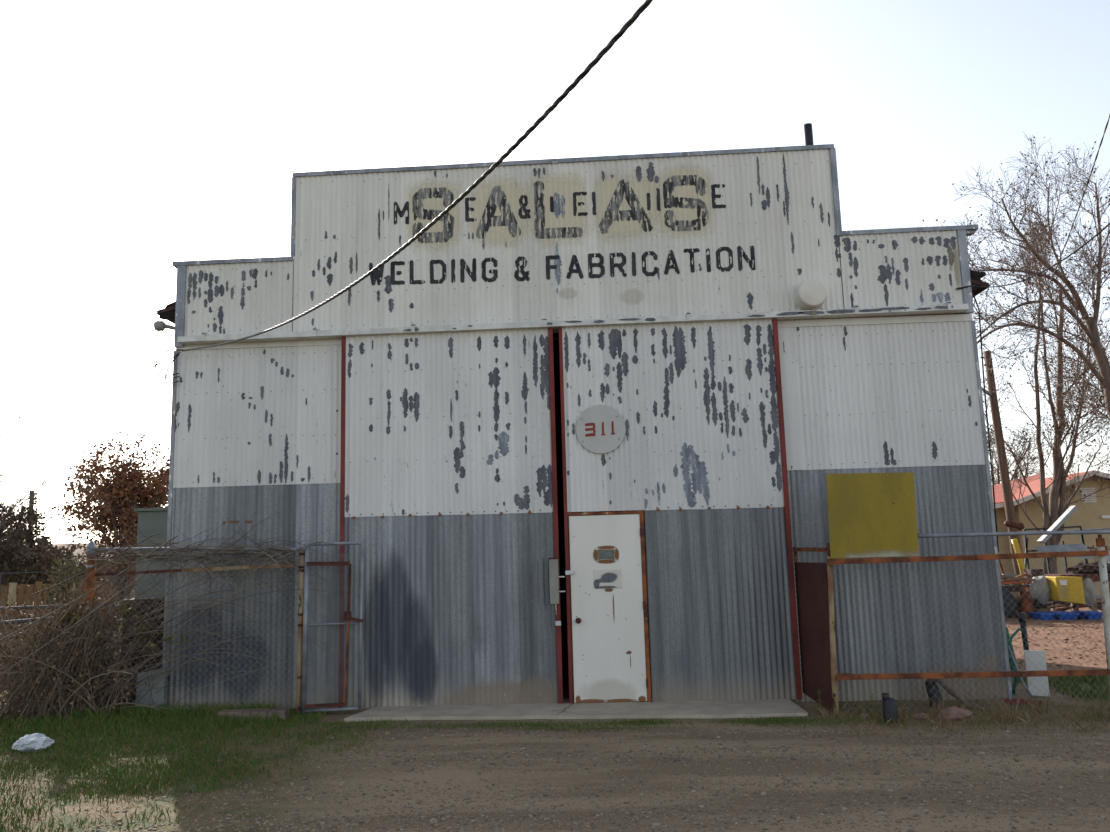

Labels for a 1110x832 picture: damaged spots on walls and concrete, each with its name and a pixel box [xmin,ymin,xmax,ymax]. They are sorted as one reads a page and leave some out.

peeling [635,162,659,183]
peeling [750,153,794,253]
peeling [312,231,358,286]
peeling [187,268,272,334]
peeling [376,275,394,313]
peeling [387,327,419,371]
peeling [448,197,956,494]
peeling [175,402,192,433]
peeling [241,386,311,484]
peeling [369,388,420,434]
peeling [497,464,553,510]
peeling [634,442,720,507]